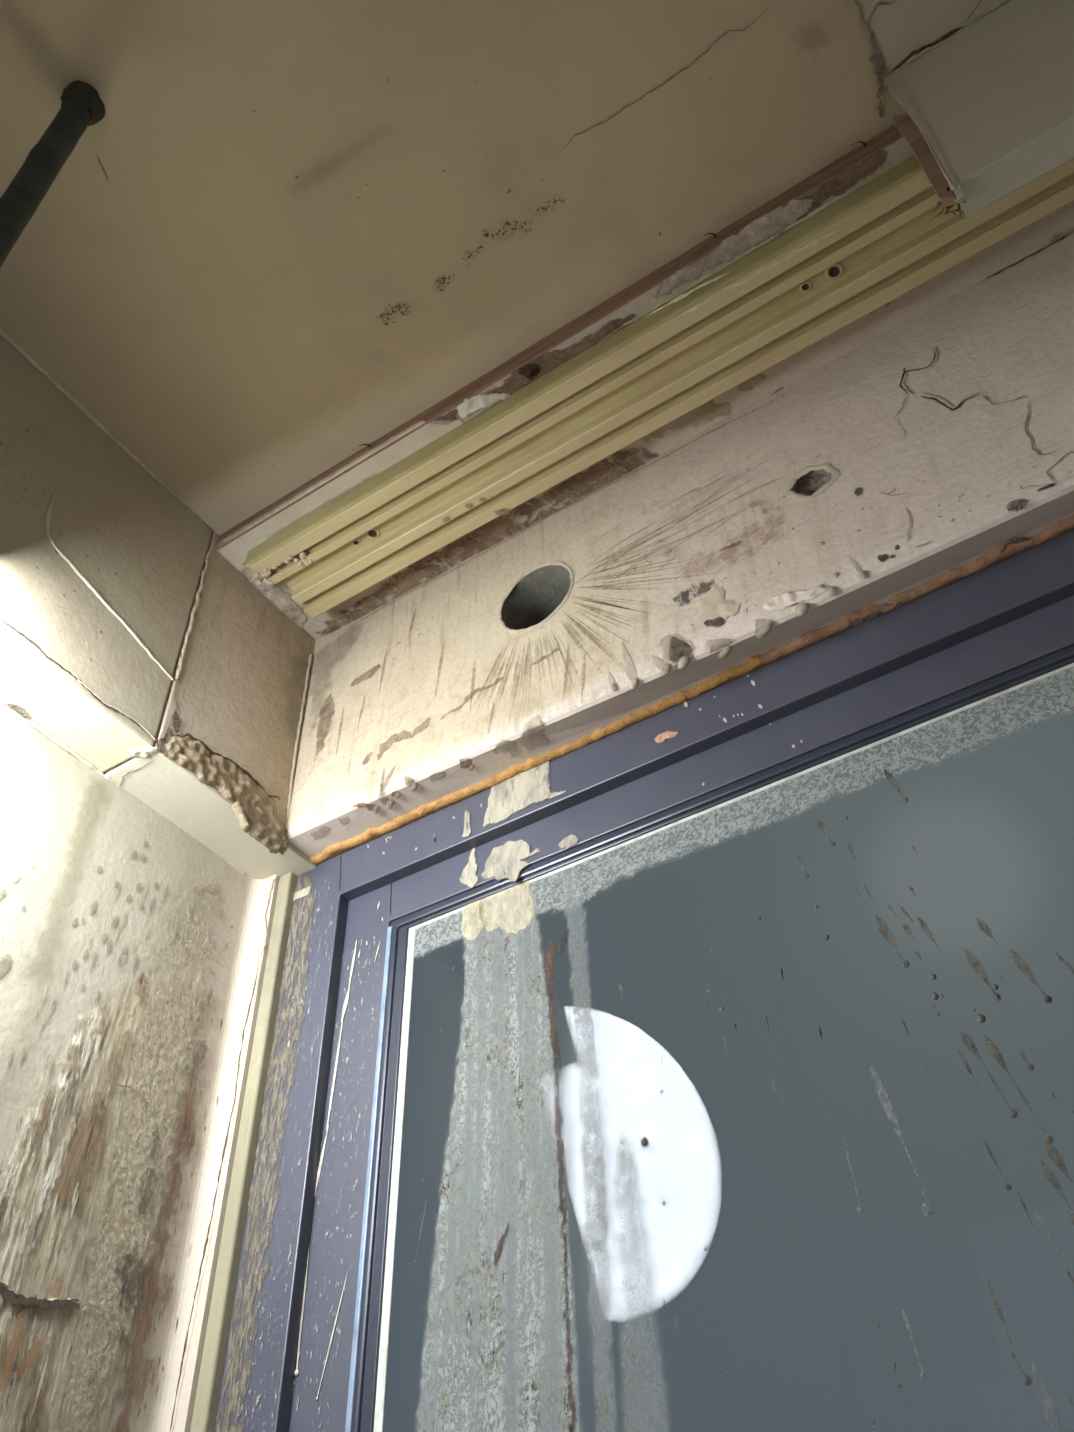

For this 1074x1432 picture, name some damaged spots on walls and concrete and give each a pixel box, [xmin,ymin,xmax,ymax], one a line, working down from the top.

crack [553,4,772,157]
crack [854,0,1011,117]
leakage [463,197,565,265]
crack [894,347,1074,491]
spalling [783,463,841,501]
crack [0,552,211,786]
flaking render [704,617,725,627]
flaking render [156,733,289,855]
leakage [31,784,102,971]
rust [112,990,223,1432]
crack [0,1282,125,1326]
leakage [25,1379,45,1432]